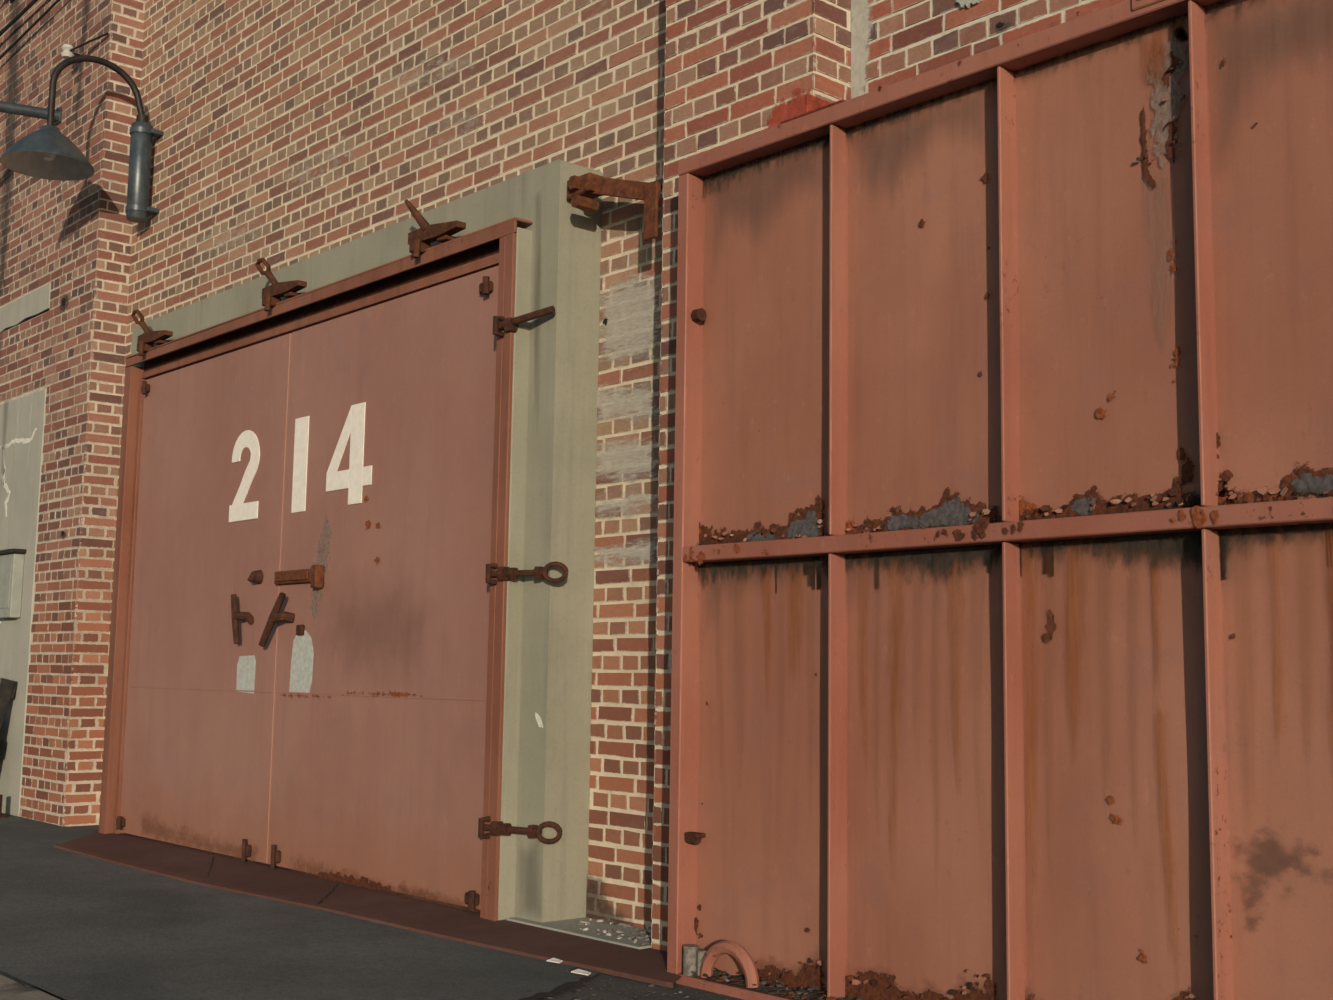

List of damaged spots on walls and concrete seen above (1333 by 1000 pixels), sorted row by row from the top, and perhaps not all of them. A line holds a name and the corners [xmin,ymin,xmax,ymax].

rust [1173,447,1194,489]
rust [1216,432,1233,498]
rust [936,512,1024,542]